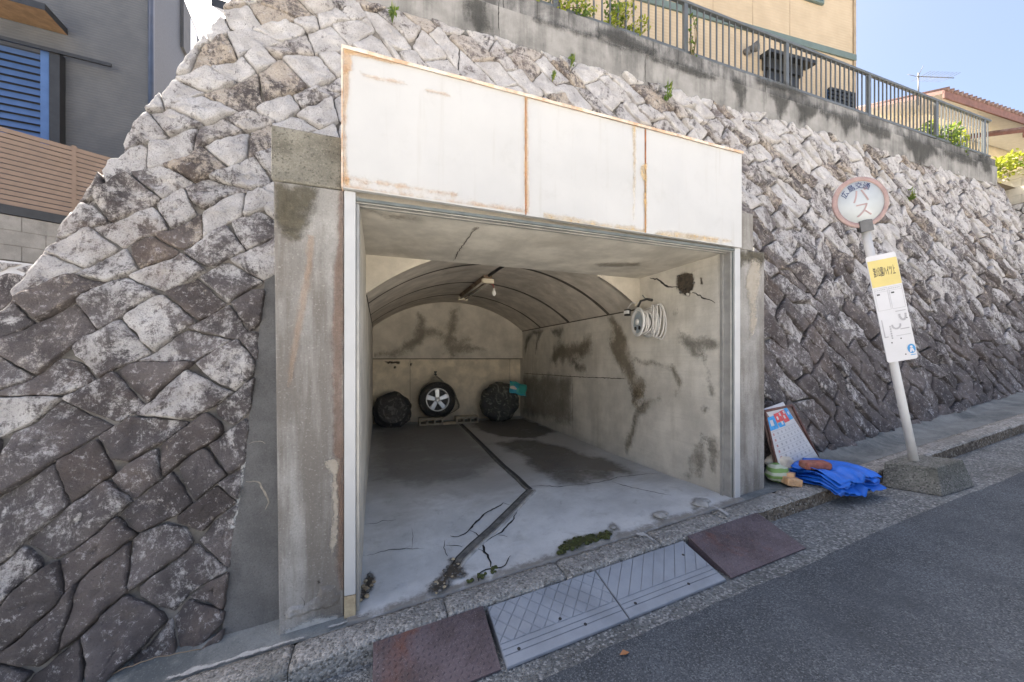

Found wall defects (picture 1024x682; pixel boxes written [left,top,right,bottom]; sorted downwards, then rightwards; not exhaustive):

leakage [275,184,316,239]
crack [651,278,715,303]
spalling [677,272,703,296]
leakage [525,330,589,369]
leakage [610,318,646,446]
leakage [475,419,628,482]
crack [375,503,517,581]